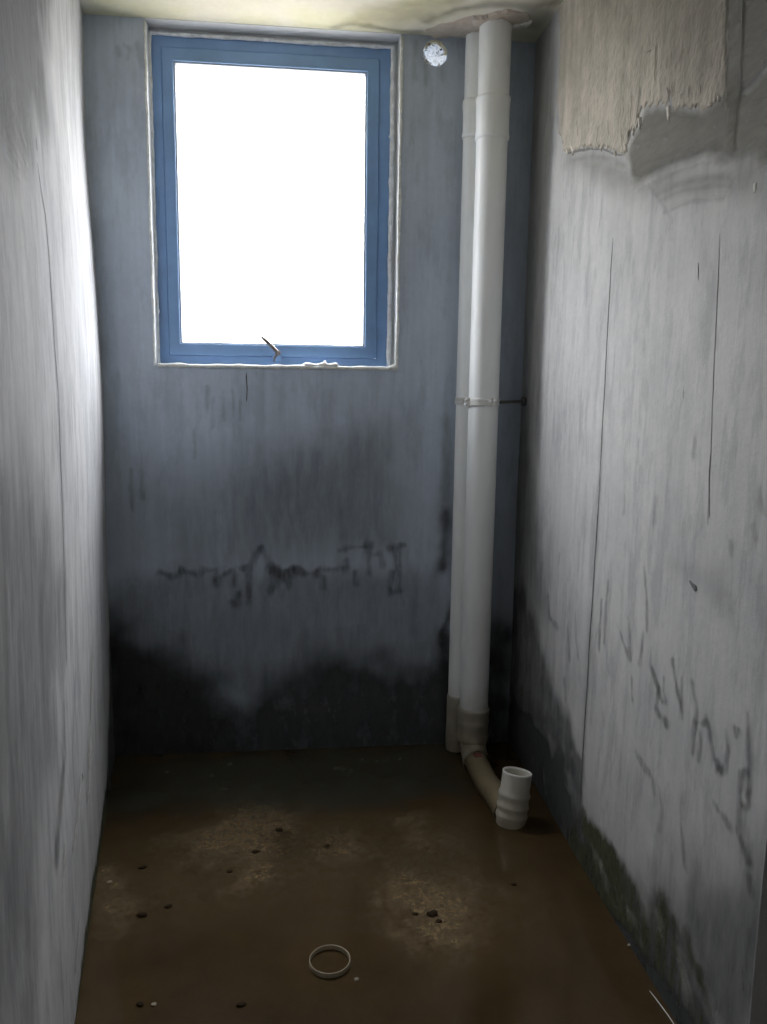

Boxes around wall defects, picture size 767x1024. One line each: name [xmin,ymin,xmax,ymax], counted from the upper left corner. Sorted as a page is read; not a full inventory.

flaking render [557,0,728,157]
crack [579,243,613,814]
water stain [110,628,450,756]
water stain [487,589,601,889]
water stain [635,897,759,1024]